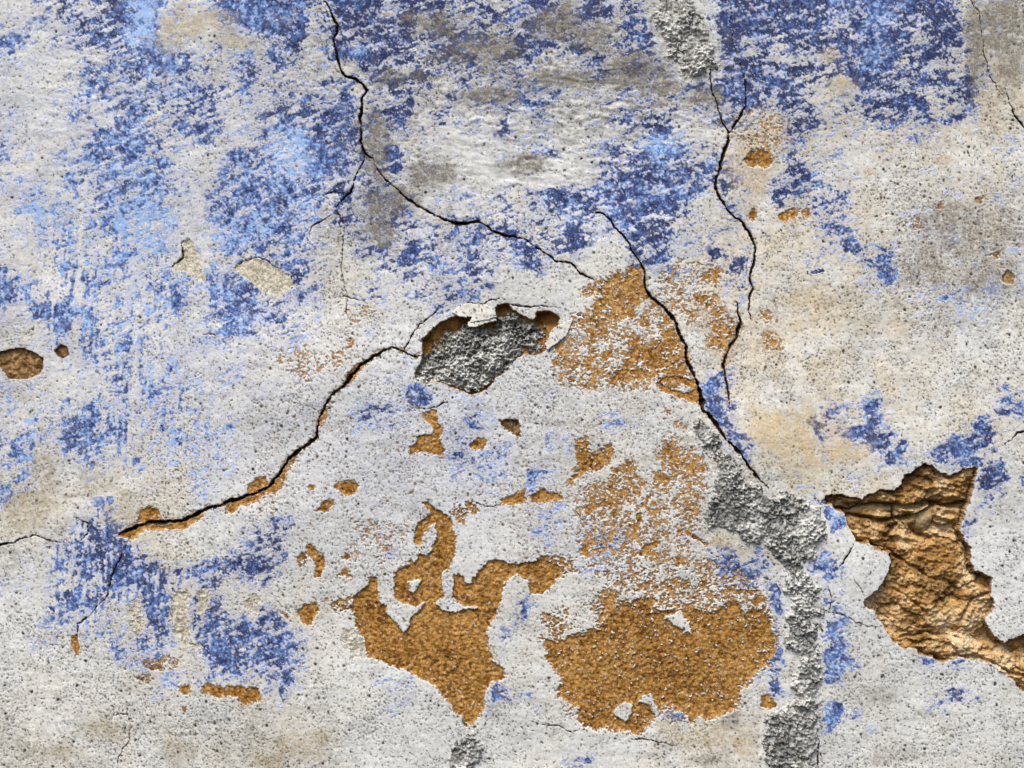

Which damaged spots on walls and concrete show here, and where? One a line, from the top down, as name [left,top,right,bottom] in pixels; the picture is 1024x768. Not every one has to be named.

crack [309,6,590,314]
peeling [0,0,1024,513]
crack [592,3,769,489]
peeling [0,495,325,708]
crack [77,309,438,636]
flaking render [325,407,792,738]
peeling [821,700,880,736]
spalling [792,379,1024,689]
peeling [925,685,980,721]